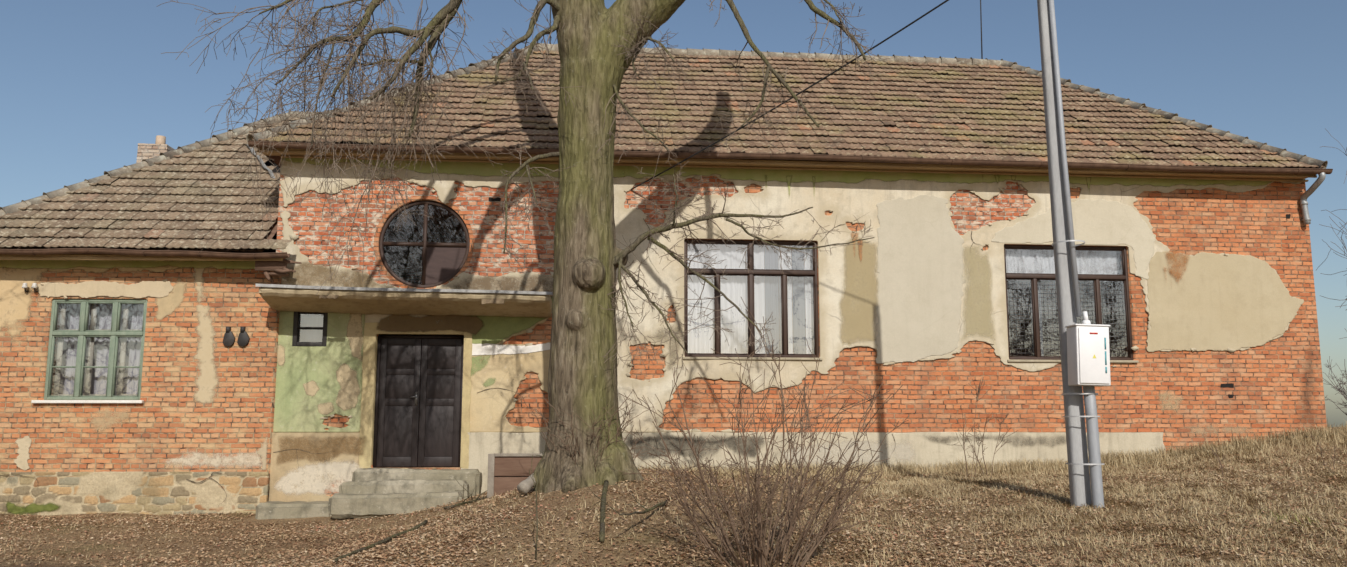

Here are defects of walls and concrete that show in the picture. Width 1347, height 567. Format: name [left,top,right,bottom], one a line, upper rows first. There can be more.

flaking render [276,174,559,288]
flaking render [624,175,763,227]
flaking render [949,181,1035,235]
spalling [1070,186,1083,199]
flaking render [500,314,552,346]
flaking render [1082,181,1327,455]
peeling [303,364,360,433]
flaking render [506,372,549,428]
flaking render [626,342,668,382]
flaking render [659,341,1066,433]